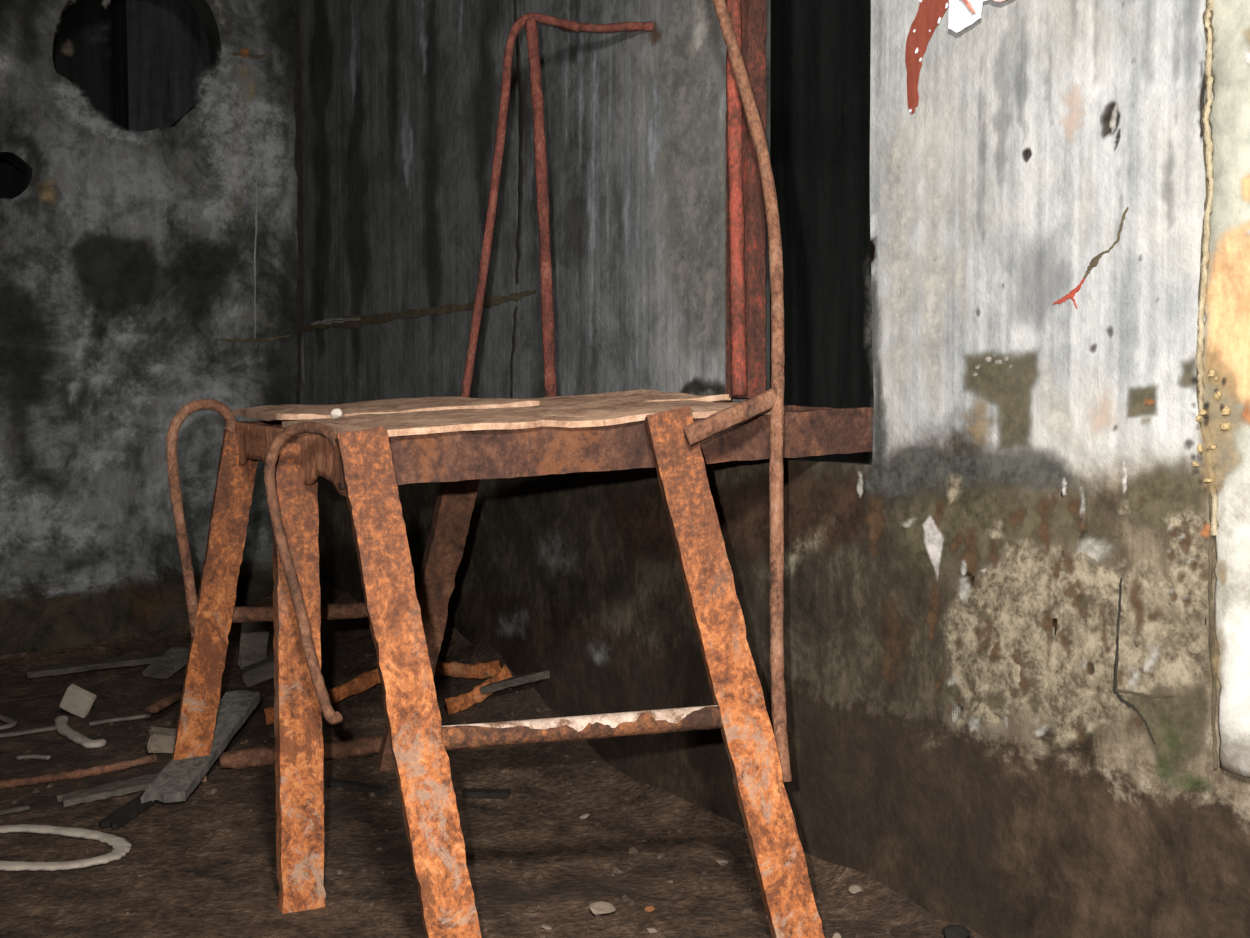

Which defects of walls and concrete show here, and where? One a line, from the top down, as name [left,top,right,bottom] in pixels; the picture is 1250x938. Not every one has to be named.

peeling [905,0,1006,114]
crack [1053,207,1128,309]
peeling [1186,224,1250,490]
leakage [1123,462,1201,529]
flaking render [947,512,1207,746]
crack [1112,578,1166,744]
leakage [1130,692,1203,769]